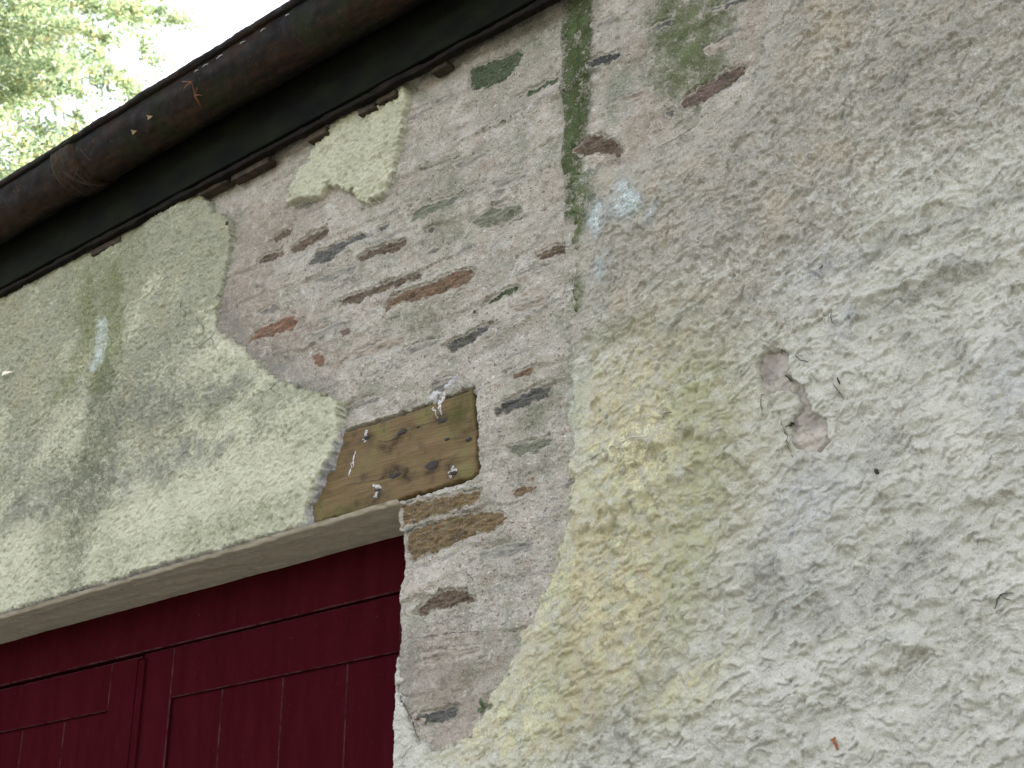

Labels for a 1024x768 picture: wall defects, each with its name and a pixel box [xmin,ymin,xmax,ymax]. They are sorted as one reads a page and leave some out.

damp [561,0,591,240]
spalling [210,0,789,752]
spalling [759,352,830,453]